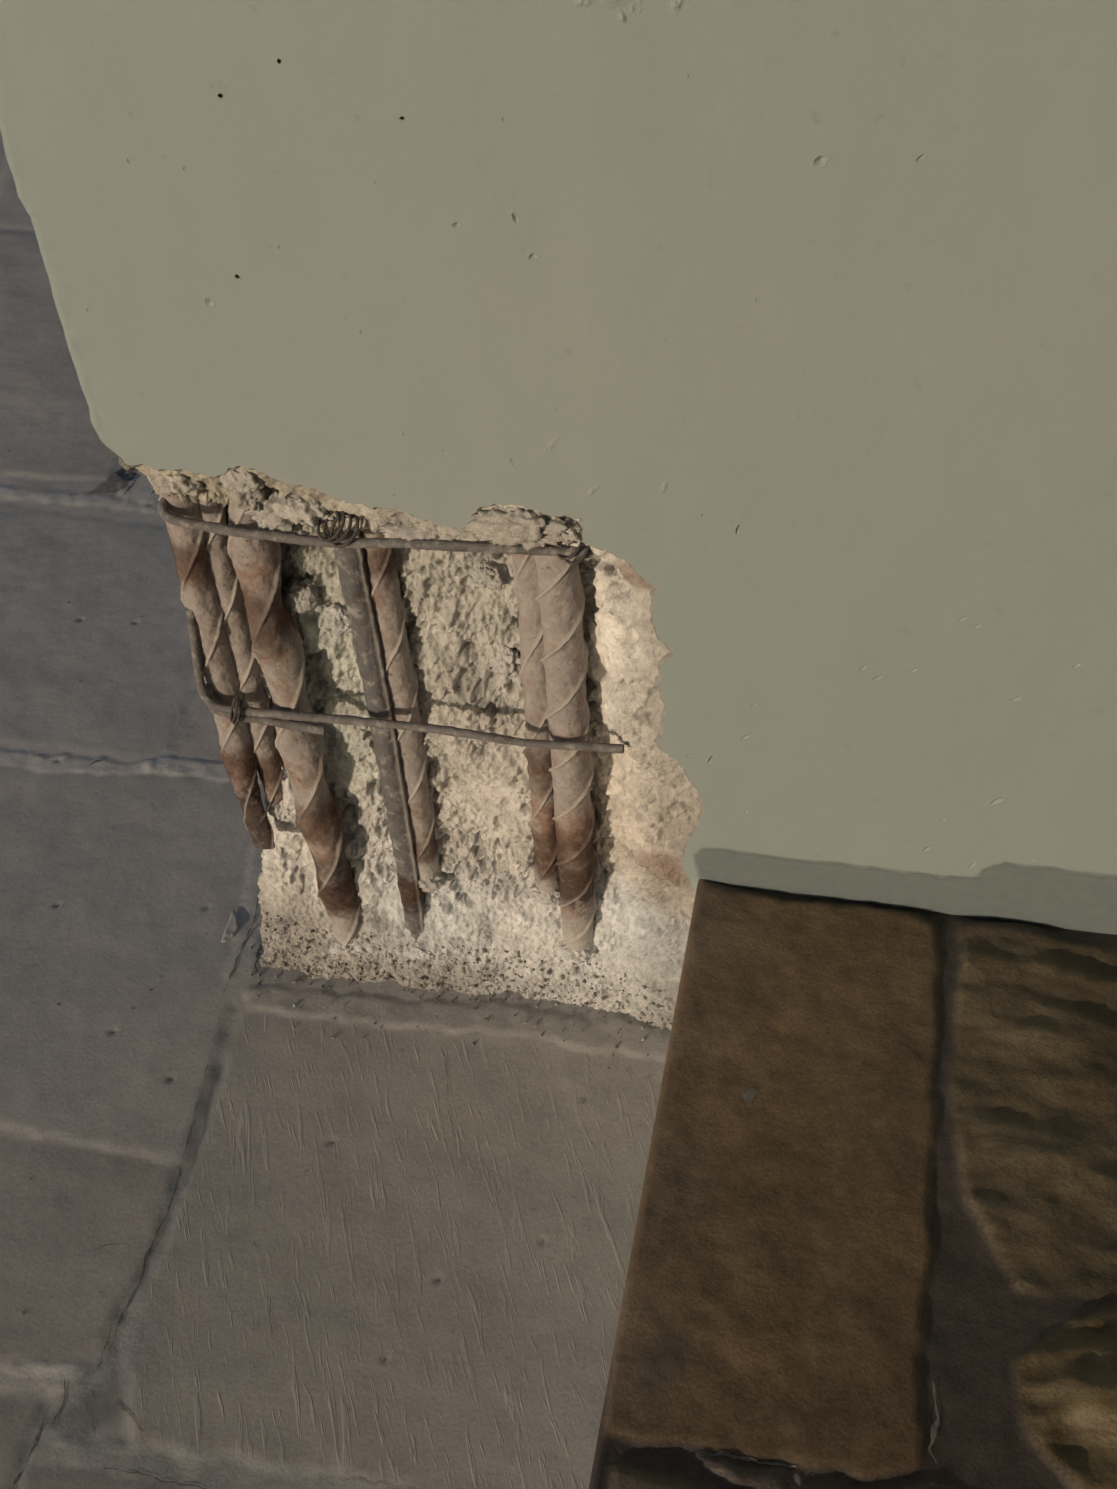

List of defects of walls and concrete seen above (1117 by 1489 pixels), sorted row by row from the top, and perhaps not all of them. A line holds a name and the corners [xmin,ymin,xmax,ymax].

corrosion [240,586,293,647]
corrosion [219,748,284,786]
spalling [89,457,704,1031]
corrosion [525,748,552,790]
corrosion [531,828,596,886]
corrosion [317,868,357,908]